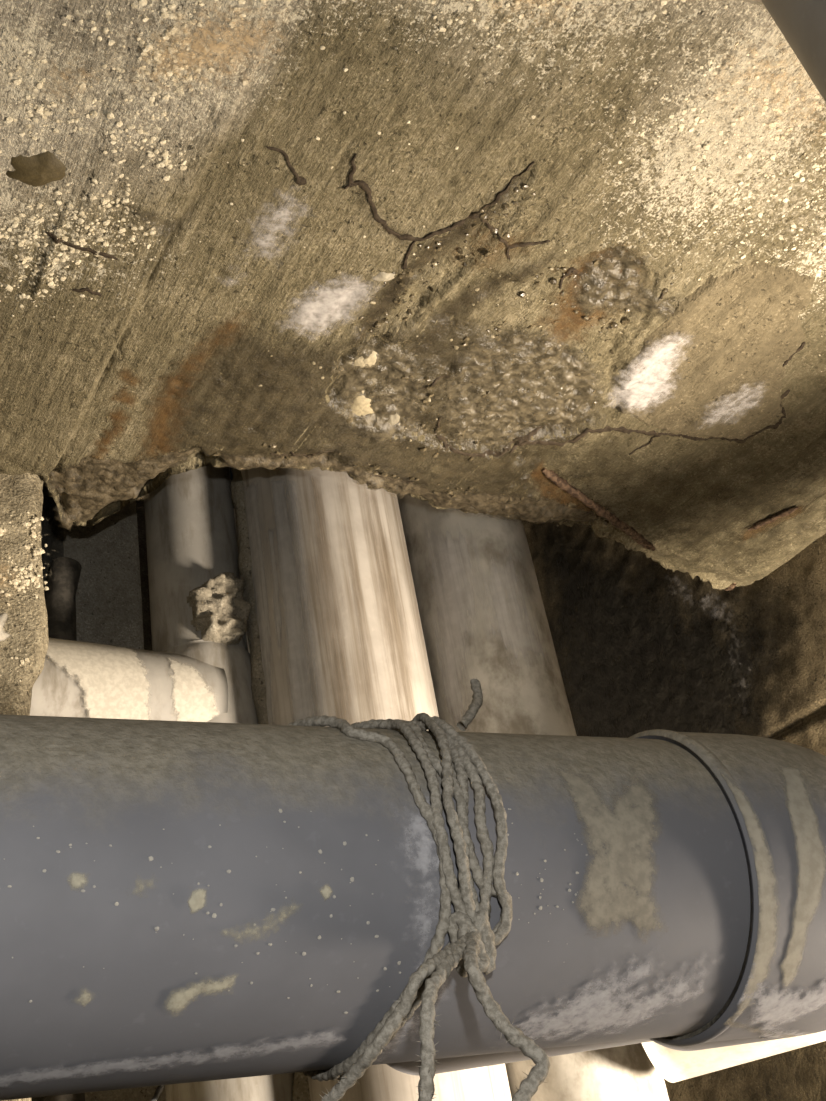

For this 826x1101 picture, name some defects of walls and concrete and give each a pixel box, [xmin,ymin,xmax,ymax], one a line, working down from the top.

water stain [422,0,588,35]
water stain [648,0,686,27]
water stain [0,0,271,307]
crack [266,146,307,185]
crack [344,154,550,270]
water stain [622,36,826,311]
crack [559,267,583,289]
water stain [162,186,591,498]
crack [435,342,805,457]
water stain [611,337,685,410]
spalling [44,448,197,529]
spalling [213,444,609,529]